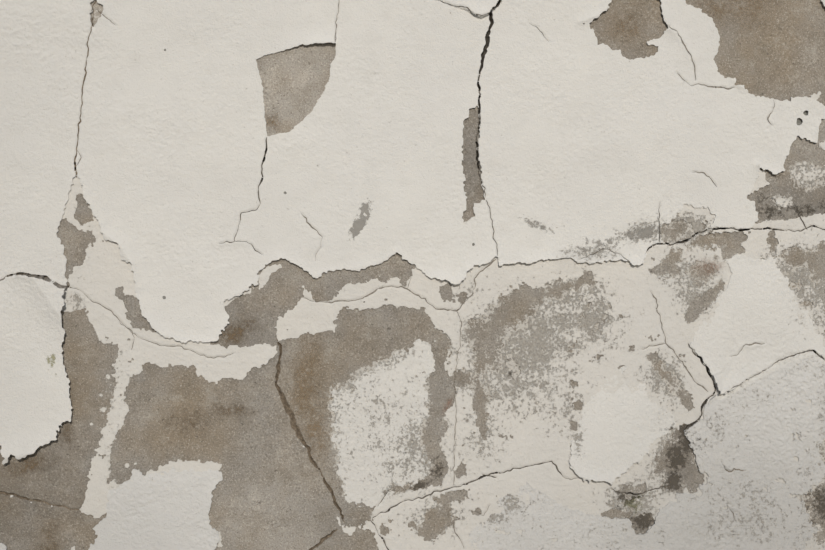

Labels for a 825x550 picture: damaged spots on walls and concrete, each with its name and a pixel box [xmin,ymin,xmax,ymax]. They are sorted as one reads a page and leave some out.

crack [74,0,114,178]
peeling [256,12,337,136]
peeling [583,0,825,106]
peeling [462,106,485,222]
peeling [57,194,104,286]
crack [0,272,233,358]
peeling [0,252,612,550]
crack [275,338,345,550]
crack [302,0,575,550]
peeling [569,119,825,534]
crack [581,207,825,266]
crack [642,291,824,432]